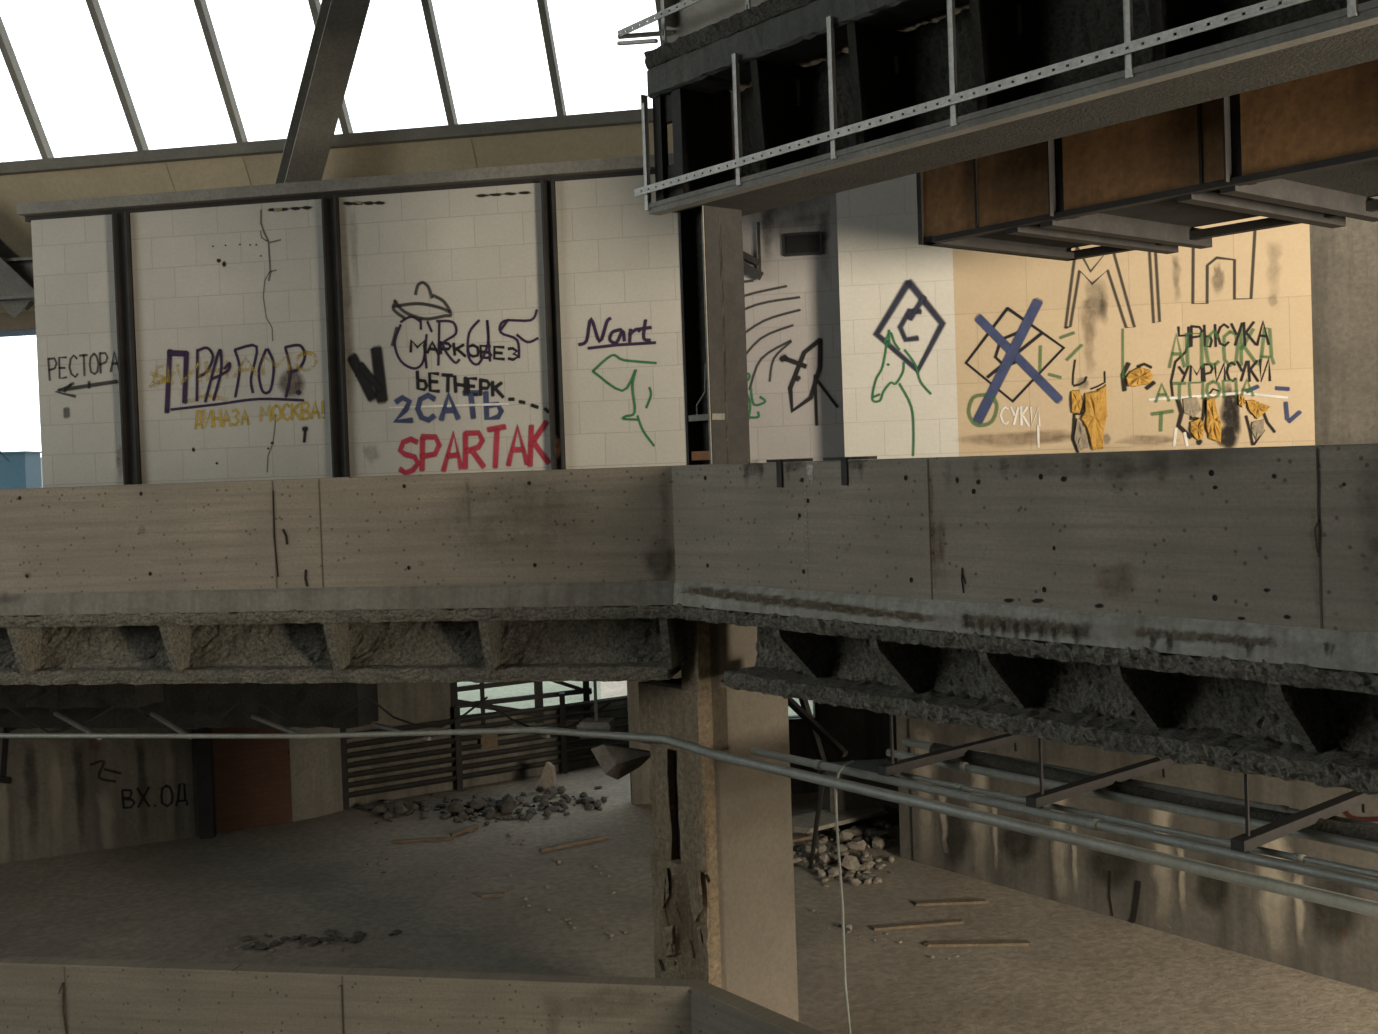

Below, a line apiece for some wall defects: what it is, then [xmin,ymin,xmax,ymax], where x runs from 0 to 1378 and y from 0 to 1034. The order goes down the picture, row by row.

crack [260,210,281,341]
peeling [683,587,933,622]
peeling [961,598,1088,641]
peeling [1136,617,1271,655]
spalling [658,750,710,971]